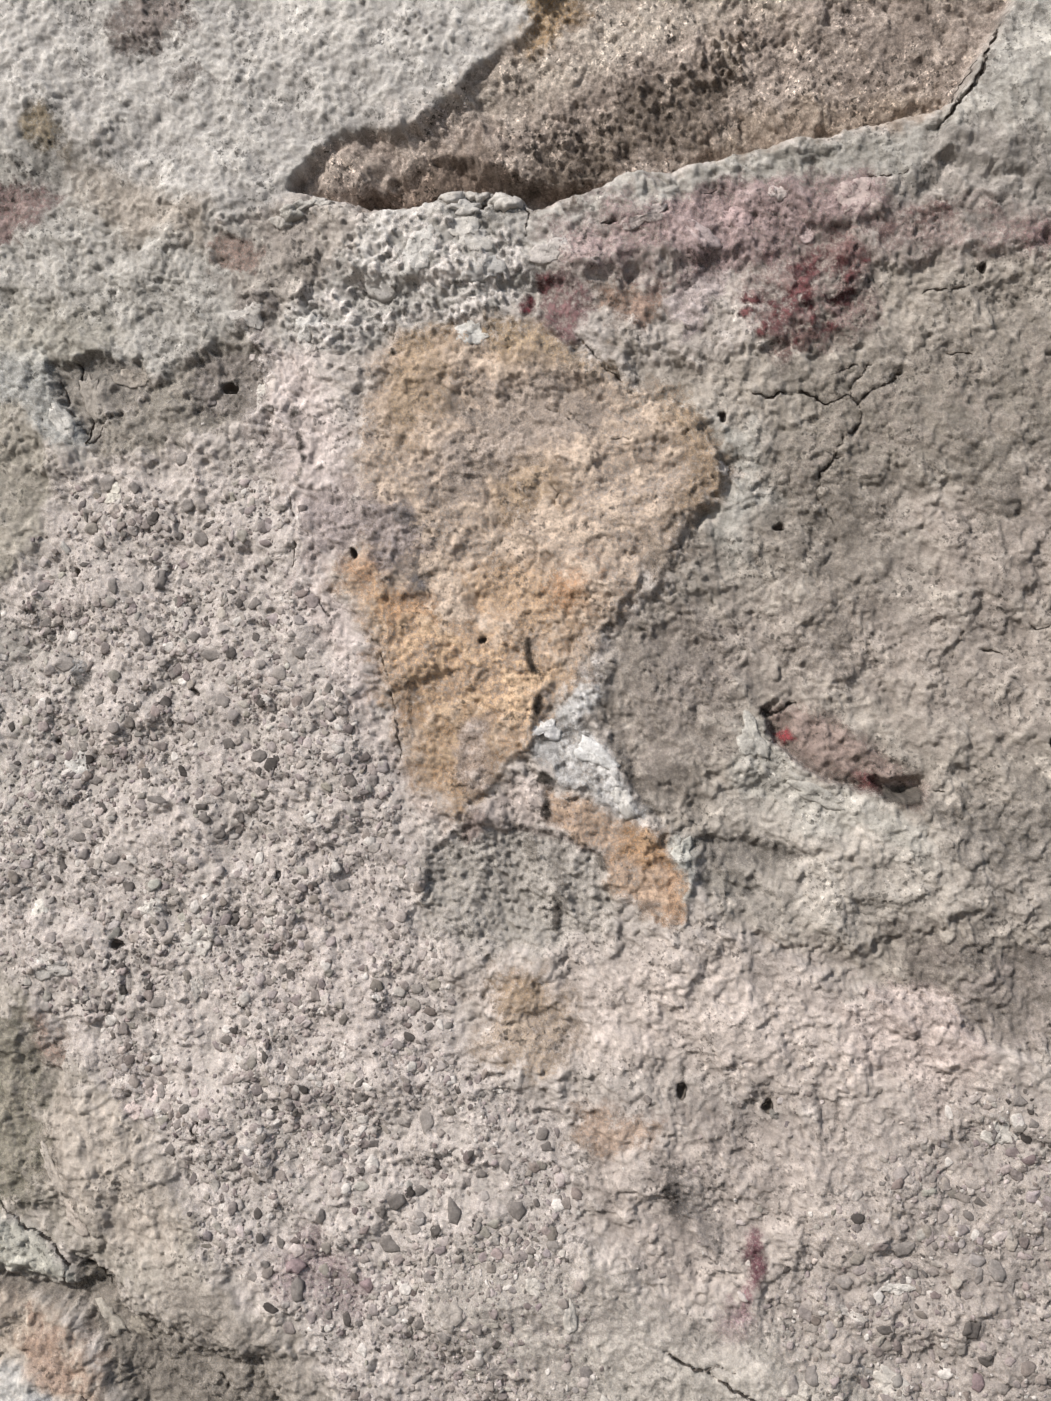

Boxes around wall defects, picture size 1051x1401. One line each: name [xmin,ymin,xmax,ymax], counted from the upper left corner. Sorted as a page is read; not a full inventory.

crack [943,25,999,122]
peeling [268,196,335,230]
crack [752,363,900,535]
corrosion [303,320,724,823]
corrosion [546,791,686,926]